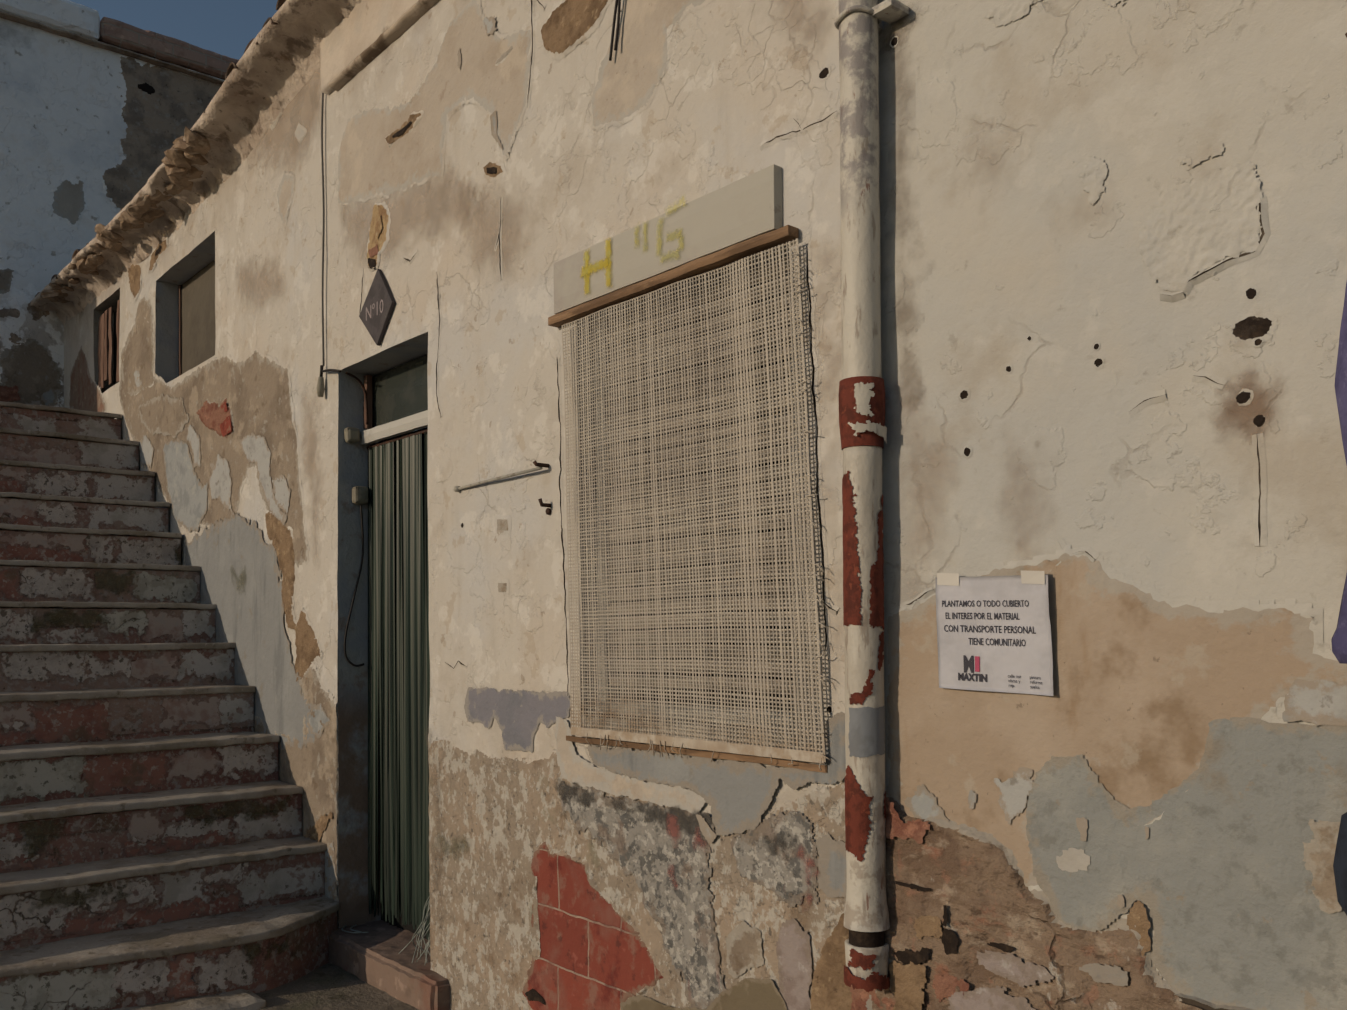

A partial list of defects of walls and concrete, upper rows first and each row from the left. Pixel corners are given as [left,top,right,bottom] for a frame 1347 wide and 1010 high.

peeling [337,0,714,271]
crack [760,105,840,151]
flaking render [0,54,338,941]
peeling [848,382,887,444]
crack [1251,433,1267,546]
flaking render [428,545,1347,1010]